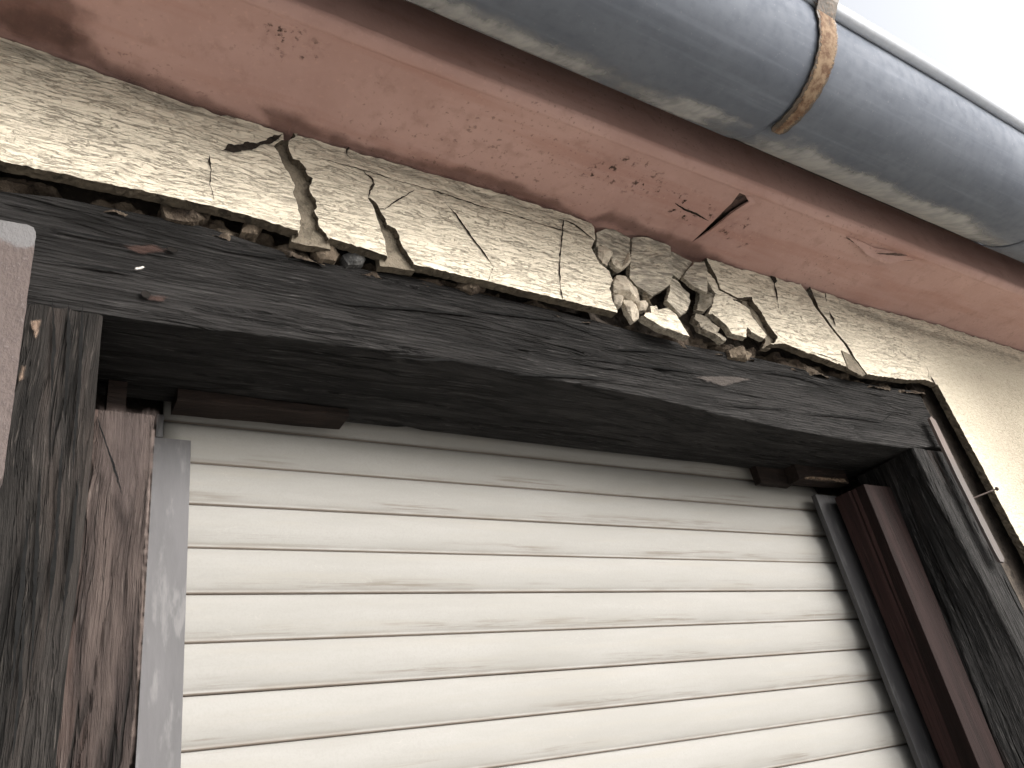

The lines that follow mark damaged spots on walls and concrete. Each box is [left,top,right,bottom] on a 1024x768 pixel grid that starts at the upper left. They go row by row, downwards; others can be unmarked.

rust [774,2,838,135]
crack [208,134,282,199]
spalling [276,140,331,253]
crack [318,147,594,300]
spalling [580,229,773,362]
crack [770,276,779,308]
crack [814,350,865,378]